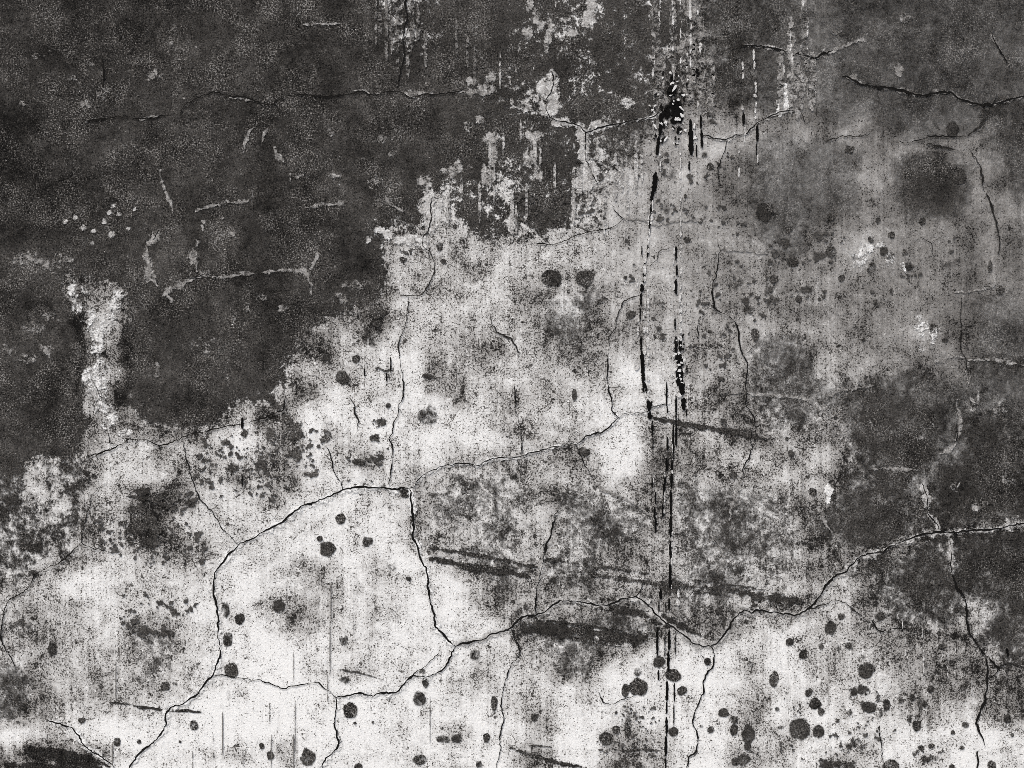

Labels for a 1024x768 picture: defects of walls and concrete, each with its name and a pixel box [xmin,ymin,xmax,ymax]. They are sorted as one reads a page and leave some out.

peeling [366,160,463,260]
peeling [466,71,496,96]
peeling [464,115,499,187]
water stain [0,0,1024,591]
peeling [506,80,640,232]
peeling [653,152,747,236]
crack [739,34,1024,454]
crack [47,197,1024,768]
water stain [517,151,804,768]
crack [0,485,110,667]